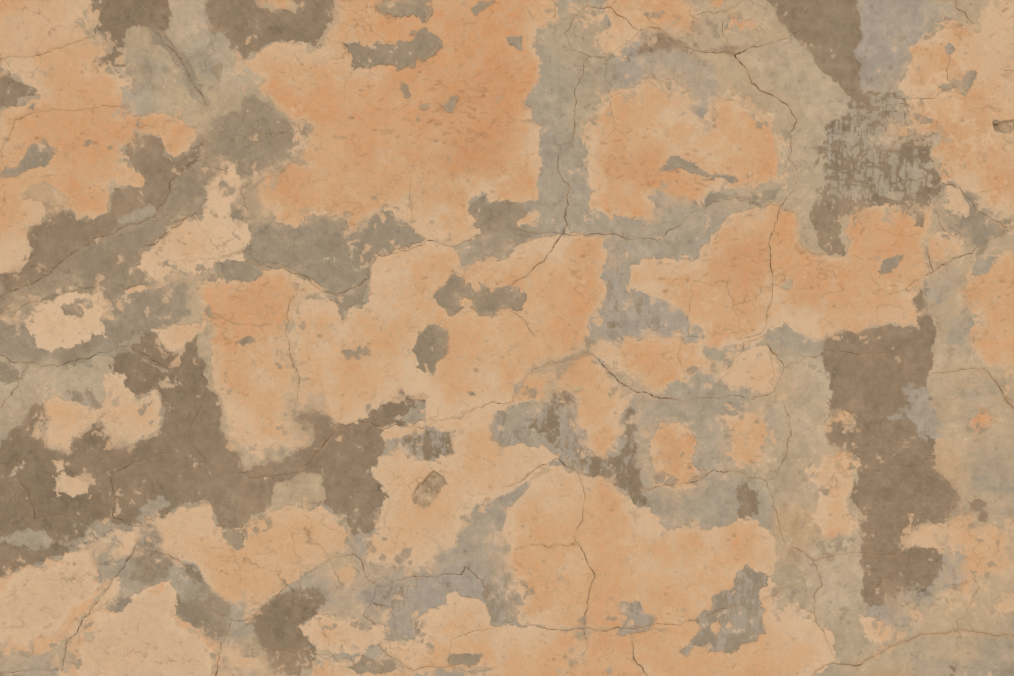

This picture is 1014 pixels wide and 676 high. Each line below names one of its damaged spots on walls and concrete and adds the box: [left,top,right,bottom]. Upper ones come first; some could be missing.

crack [156,3,209,108]
peeling [580,0,705,58]
crack [1,159,204,318]
peeling [0,0,561,321]
crack [244,234,482,399]
peeling [580,58,799,245]
crack [445,1,1014,676]
peeling [704,0,1014,367]
crack [0,331,426,675]
peeling [0,202,961,676]
peeling [970,499,989,523]
crack [350,554,497,671]